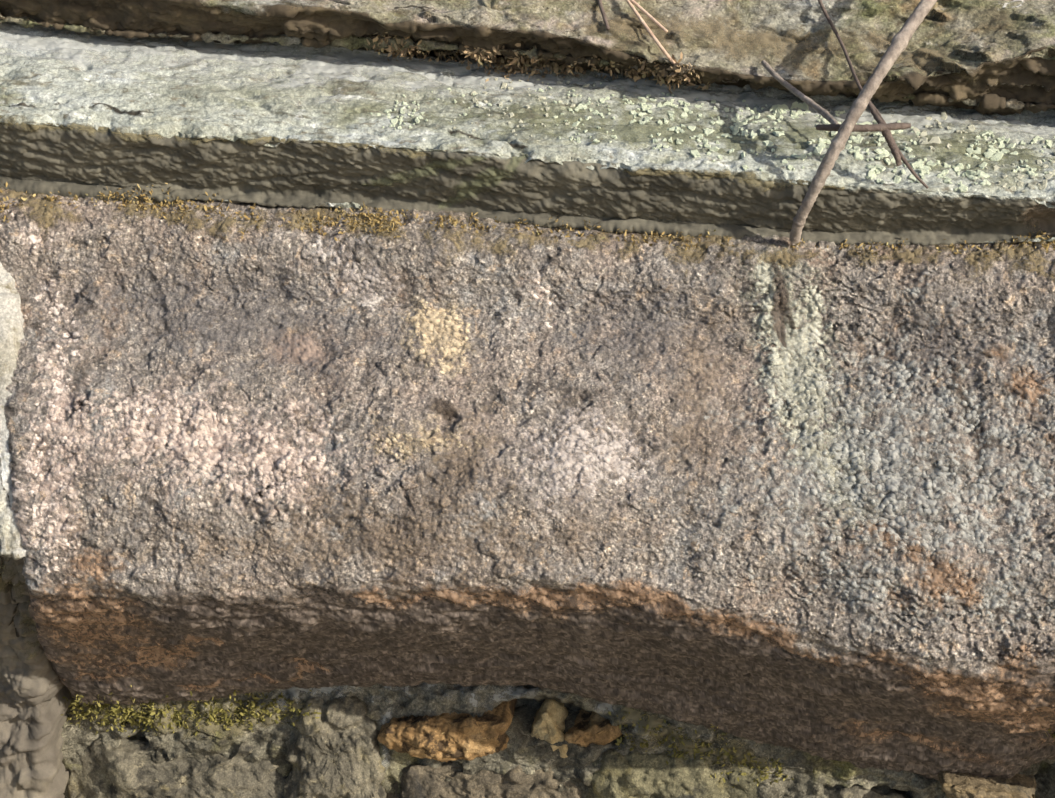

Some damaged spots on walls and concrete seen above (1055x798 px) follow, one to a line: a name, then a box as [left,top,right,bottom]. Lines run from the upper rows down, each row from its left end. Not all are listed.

crack [0,556,19,637]